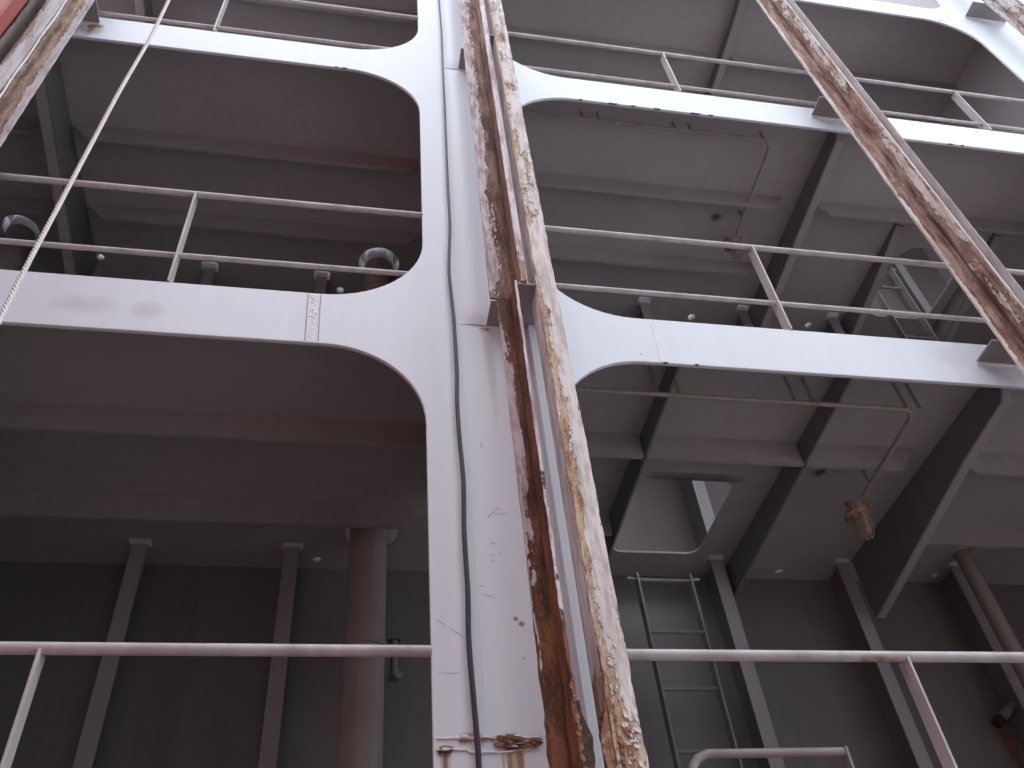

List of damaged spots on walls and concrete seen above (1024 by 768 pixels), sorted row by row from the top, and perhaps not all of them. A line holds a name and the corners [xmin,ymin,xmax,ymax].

peeling [460,732,539,747]
peeling [599,631,647,768]